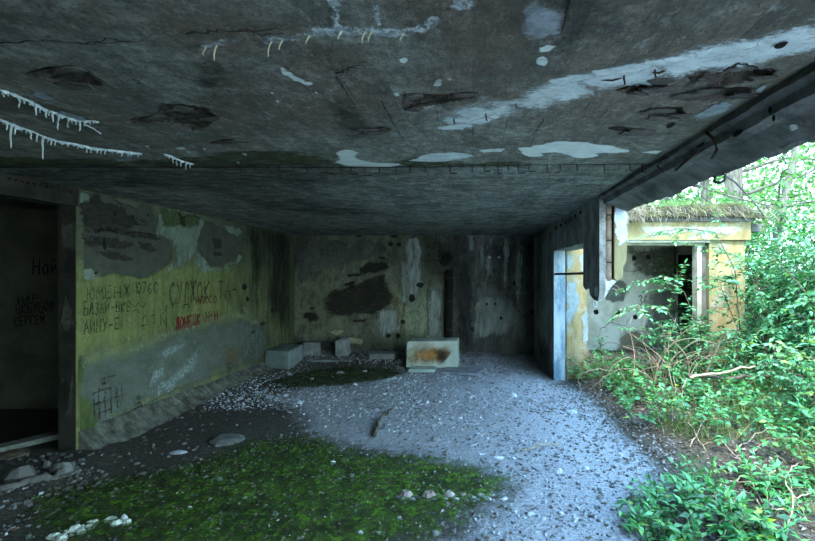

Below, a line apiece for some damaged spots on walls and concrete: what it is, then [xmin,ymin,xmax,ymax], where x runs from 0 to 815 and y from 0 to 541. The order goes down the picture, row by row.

crack [0,37,144,45]
crack [185,28,288,36]
damp [263,0,440,44]
damp [523,0,607,66]
spalling [129,104,220,132]
damp [0,89,505,191]
spalling [402,92,481,112]
damp [438,24,815,130]
spalling [601,62,778,136]
peeling [62,193,173,280]
damp [379,237,441,338]
peeling [605,280,627,303]